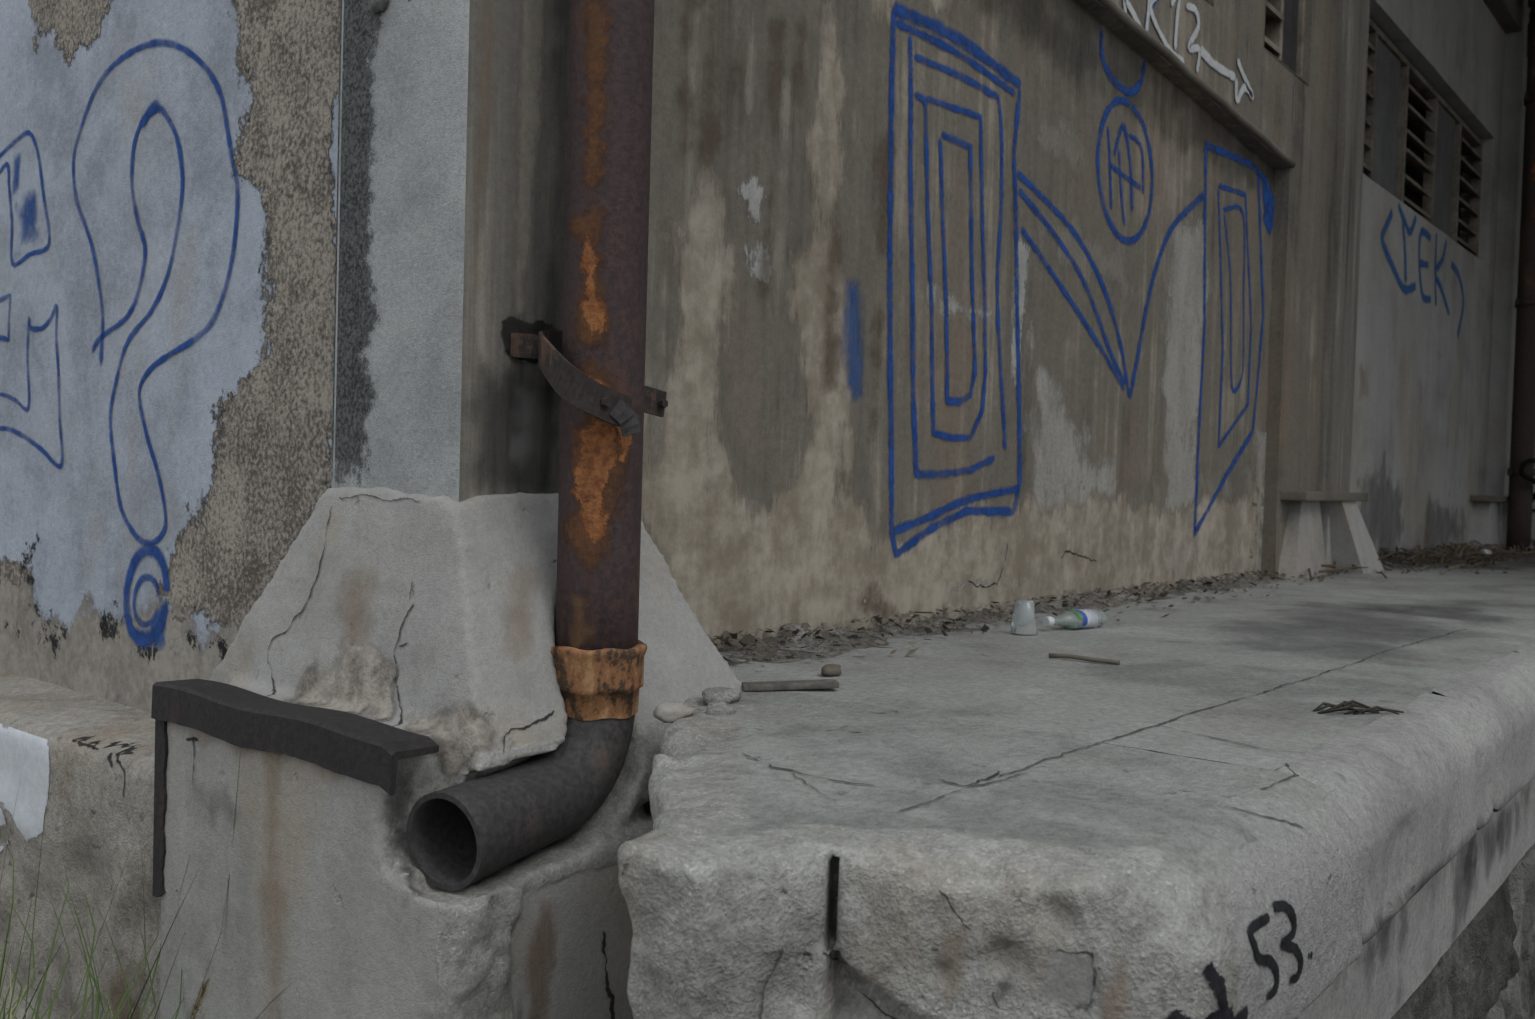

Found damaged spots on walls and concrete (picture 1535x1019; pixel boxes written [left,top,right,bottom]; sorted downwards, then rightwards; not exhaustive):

corrosion [582,0,612,188]
damp [746,25,802,143]
peeling [0,0,341,713]
corrosion [570,207,612,389]
corrosion [562,413,633,568]
peeling [0,723,50,852]
crack [267,494,421,696]
crack [394,582,414,726]
crack [503,710,554,748]
crack [744,629,1466,828]
crack [823,952,896,1019]
crack [939,891,970,930]